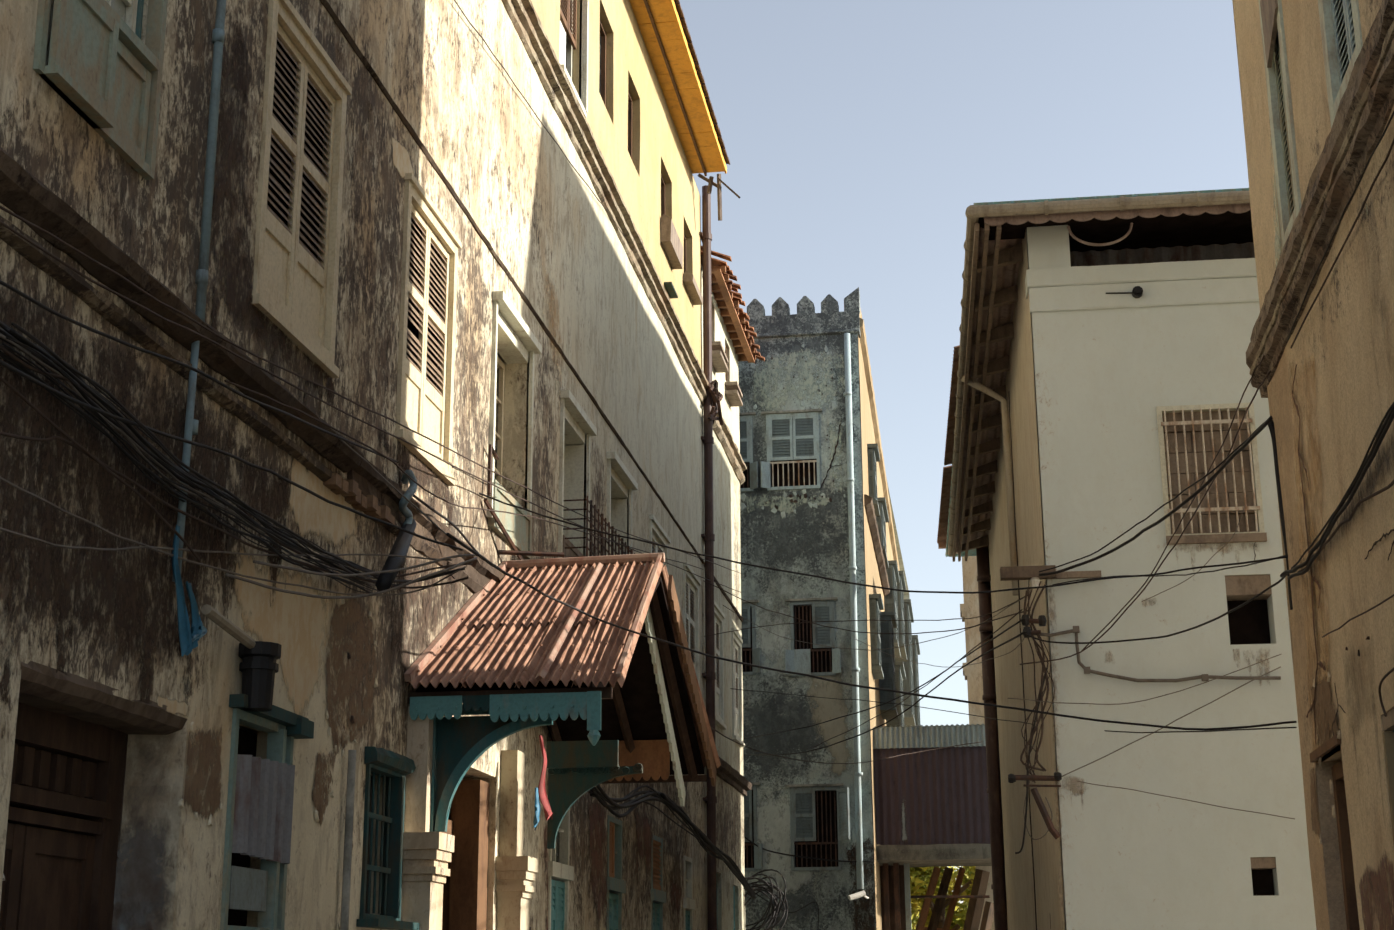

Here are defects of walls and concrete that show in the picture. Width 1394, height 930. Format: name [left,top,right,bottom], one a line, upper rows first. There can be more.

damp [211,24,337,413]
damp [0,275,294,738]
crack [1365,529,1394,560]
spalling [156,696,223,826]
flaking render [232,548,378,824]